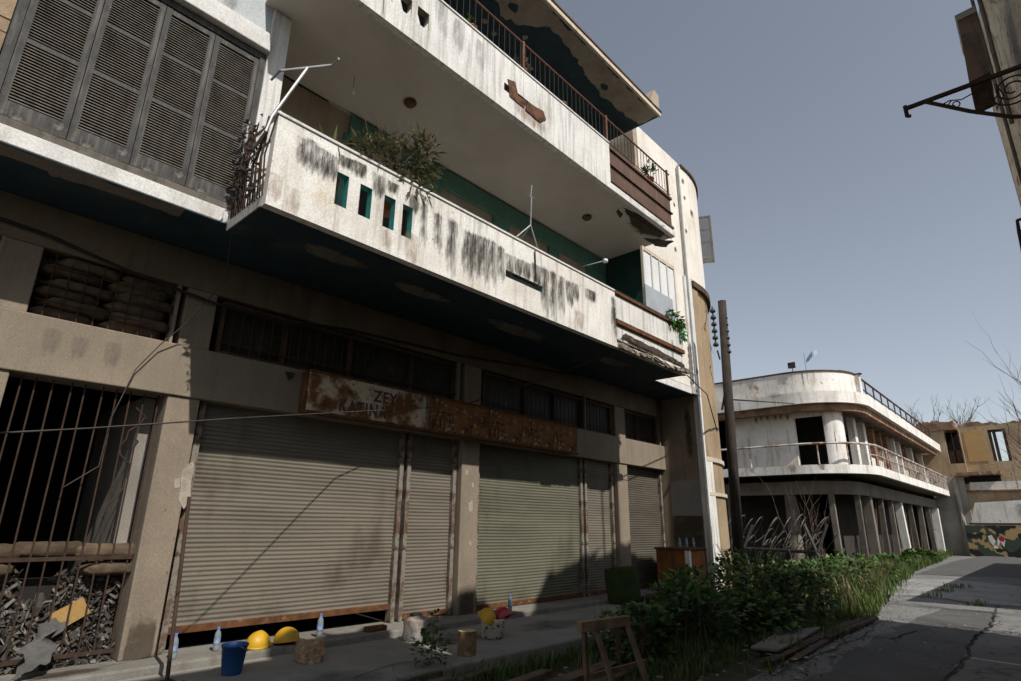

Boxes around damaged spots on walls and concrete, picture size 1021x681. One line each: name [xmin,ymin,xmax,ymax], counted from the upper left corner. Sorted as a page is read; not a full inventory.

peeling [495,0,656,126]
leakage [300,139,367,180]
leakage [374,177,399,198]
leakage [410,196,595,306]
crack [925,596,1013,681]